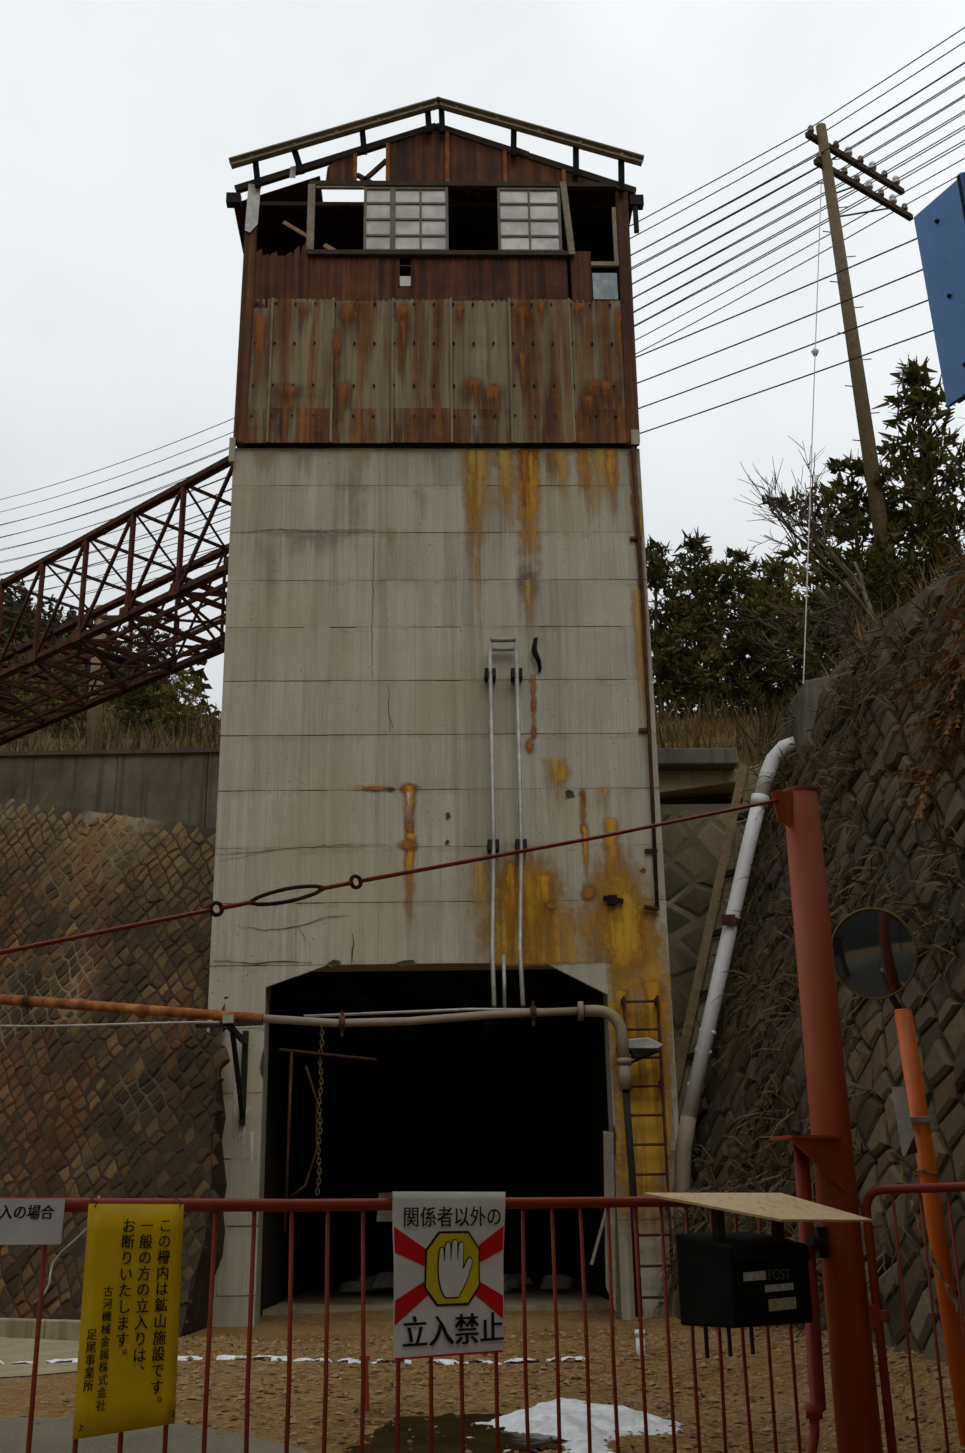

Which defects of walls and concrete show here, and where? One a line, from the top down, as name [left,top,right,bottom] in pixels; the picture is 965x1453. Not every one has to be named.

rust [466,448,646,698]
rust [525,675,536,751]
rust [361,783,418,899]
rust [579,789,589,871]